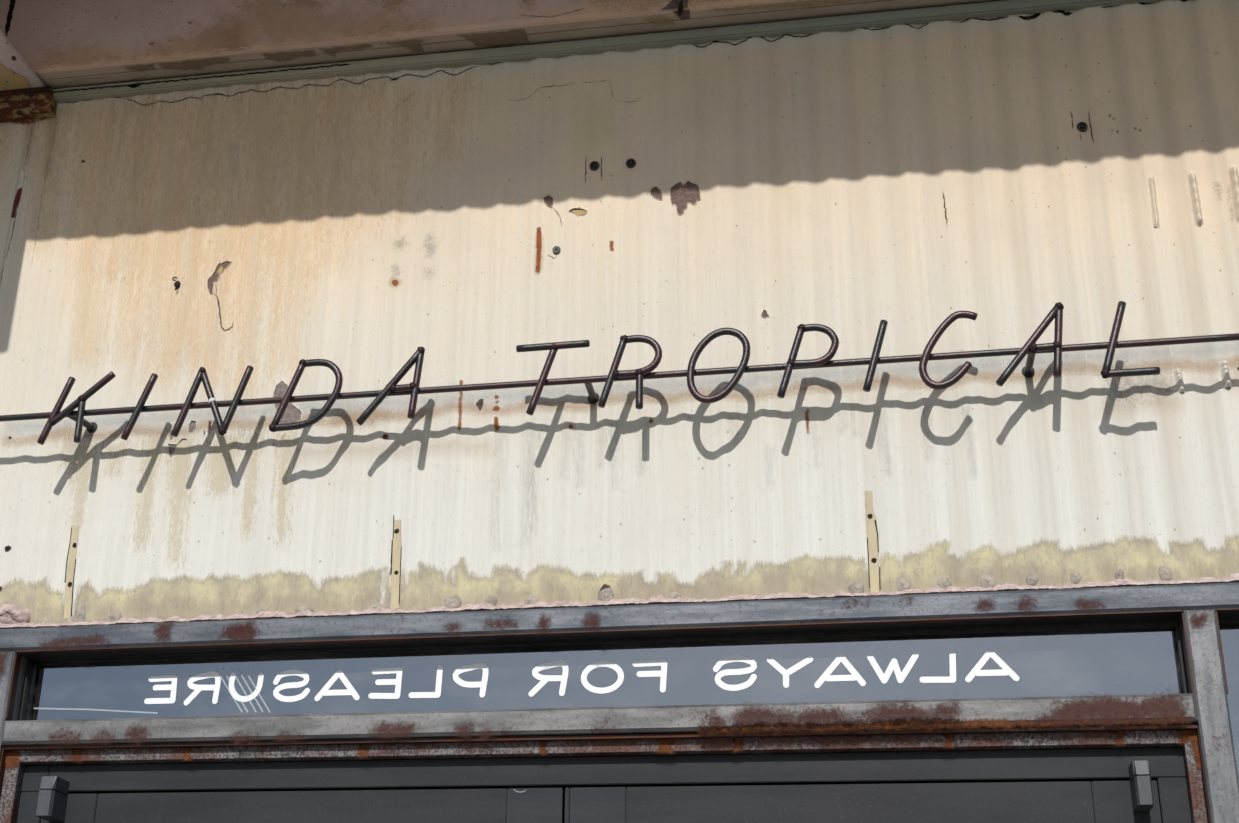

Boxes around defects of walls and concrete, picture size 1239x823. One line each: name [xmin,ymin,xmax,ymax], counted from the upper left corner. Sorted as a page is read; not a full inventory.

crack [959,0,1187,23]
crack [693,34,811,48]
crack [1,62,501,280]
spalling [650,180,701,216]
spalling [207,261,232,295]
leakage [64,428,120,524]
leakage [136,436,159,541]
leakage [211,435,258,533]
corrosion [154,621,173,641]
corrosion [220,621,255,640]
corrosion [1189,611,1207,628]
corrosion [359,723,413,758]